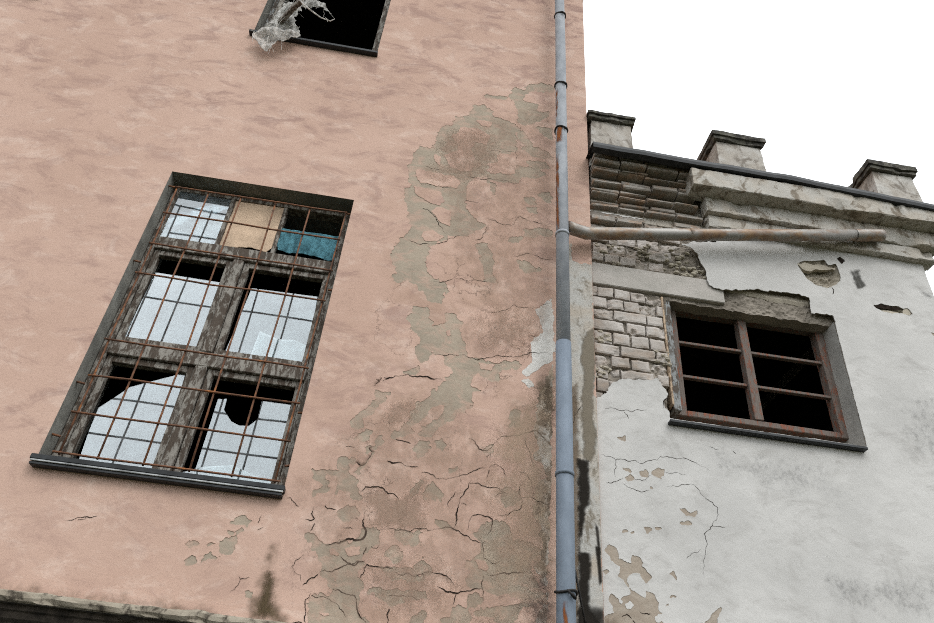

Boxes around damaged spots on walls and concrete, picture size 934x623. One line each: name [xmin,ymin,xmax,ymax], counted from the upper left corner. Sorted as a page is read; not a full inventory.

flaking render [589,153,708,229]
flaking render [304,83,556,623]
flaking render [797,257,844,288]
flaking render [874,304,911,315]
flaking render [569,240,834,623]
spalling [184,515,252,566]
crack [280,430,549,623]
crack [604,447,736,574]